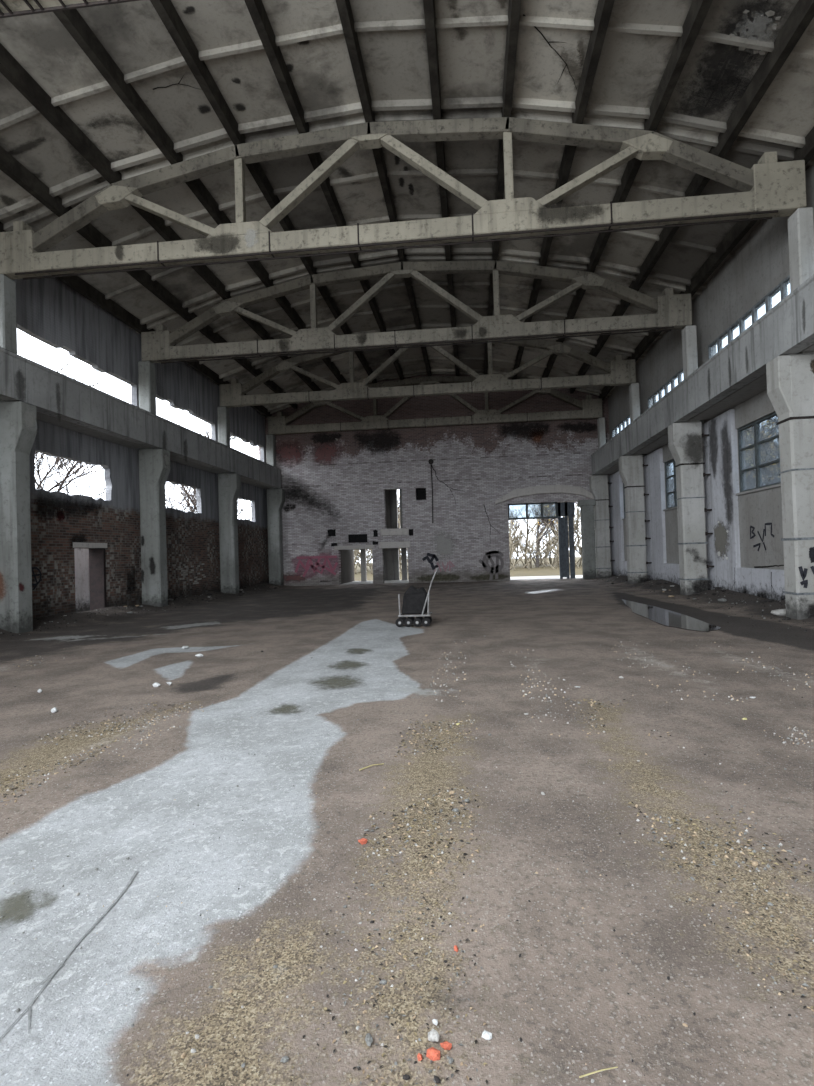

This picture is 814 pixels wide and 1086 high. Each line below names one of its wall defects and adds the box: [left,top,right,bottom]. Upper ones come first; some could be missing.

water stain [685,420,732,523]